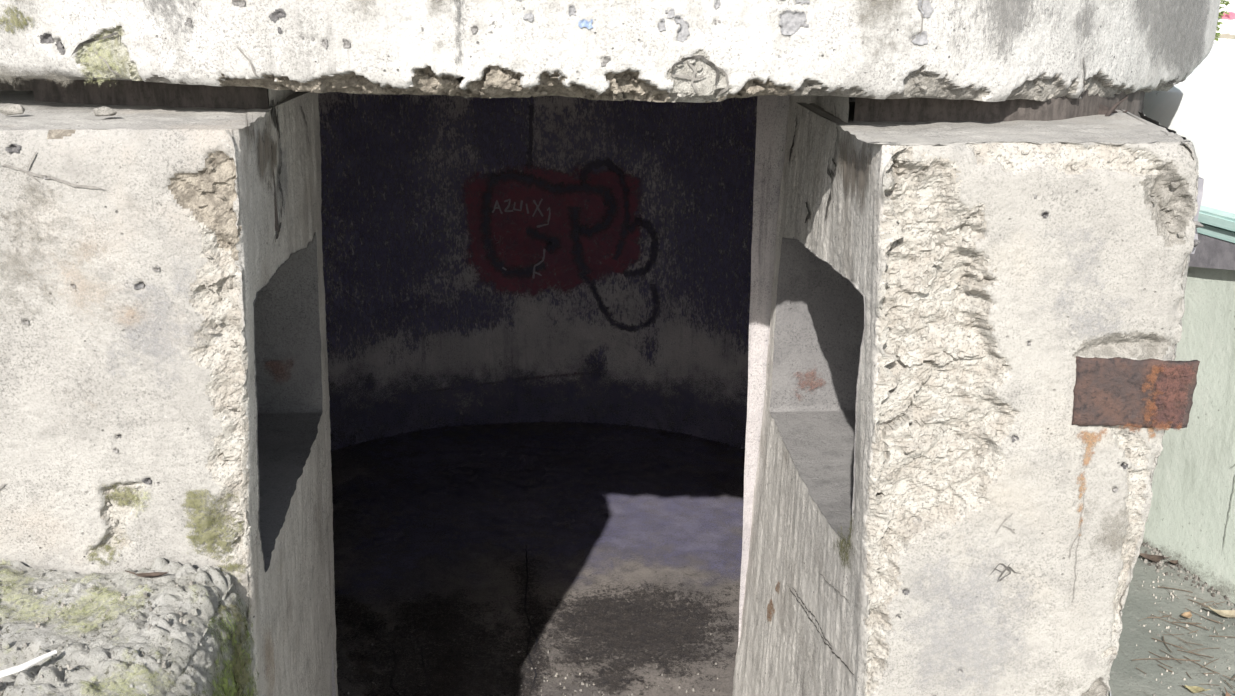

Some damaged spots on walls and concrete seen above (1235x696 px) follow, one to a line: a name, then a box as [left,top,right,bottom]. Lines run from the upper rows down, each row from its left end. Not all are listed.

spalling [39,25,187,84]
spalling [217,5,990,103]
spalling [1006,71,1185,101]
spalling [966,143,1195,247]
spalling [167,151,251,576]
spalling [863,144,1020,696]
spalling [1072,330,1171,360]
corrosion [1148,363,1195,438]
corrosion [1078,430,1106,536]
water stain [332,421,745,696]
spalling [1101,425,1151,658]
crack [789,588,857,681]